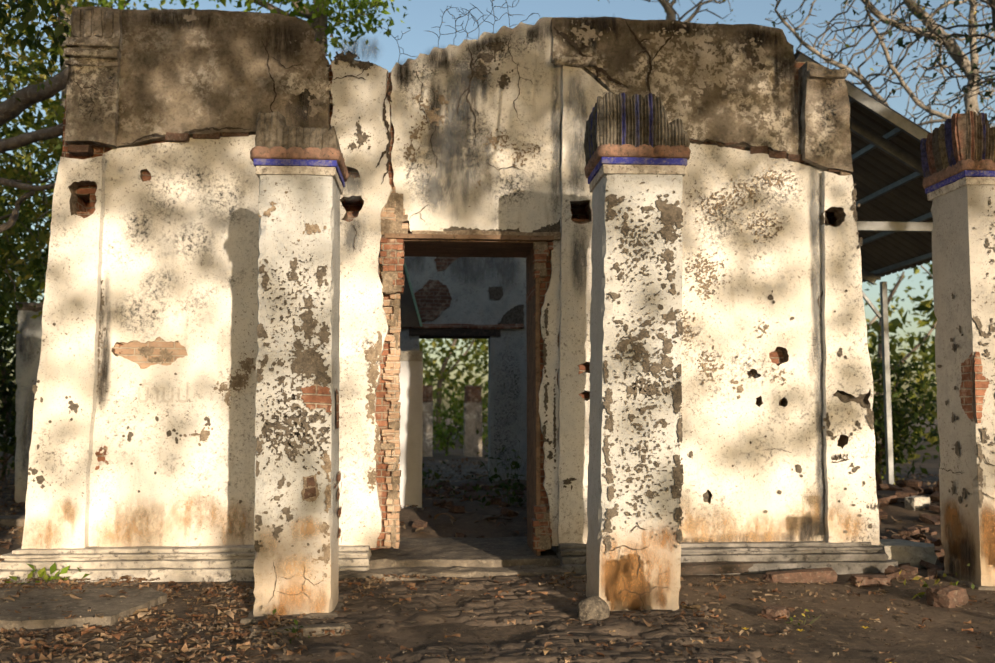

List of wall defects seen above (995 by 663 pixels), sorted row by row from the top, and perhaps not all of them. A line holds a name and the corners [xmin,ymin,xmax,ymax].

crack [263,44,303,112]
crack [331,68,392,184]
crack [415,33,533,174]
water stain [397,27,551,207]
peeling [563,18,611,46]
peeling [639,19,768,99]
flaking render [96,280,188,404]
peeling [212,223,343,578]
spalling [414,257,460,322]
spalling [603,166,802,558]
peeling [981,197,995,279]